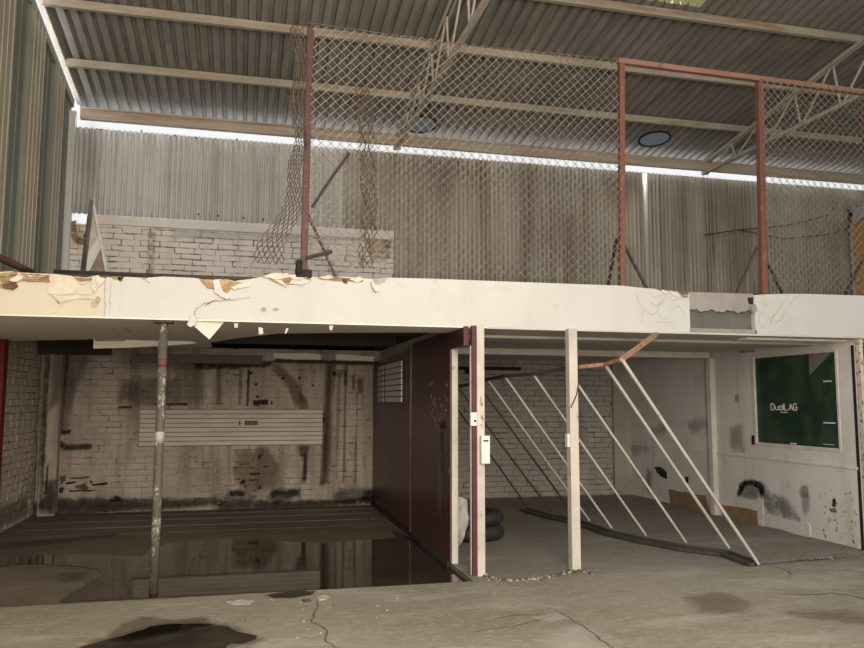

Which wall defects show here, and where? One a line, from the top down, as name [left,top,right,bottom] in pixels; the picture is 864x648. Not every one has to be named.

peeling [0,271,124,308]
flaking render [199,278,252,300]
water stain [0,354,372,524]
water stain [737,480,798,518]
crack [311,600,337,648]
crack [473,610,614,648]